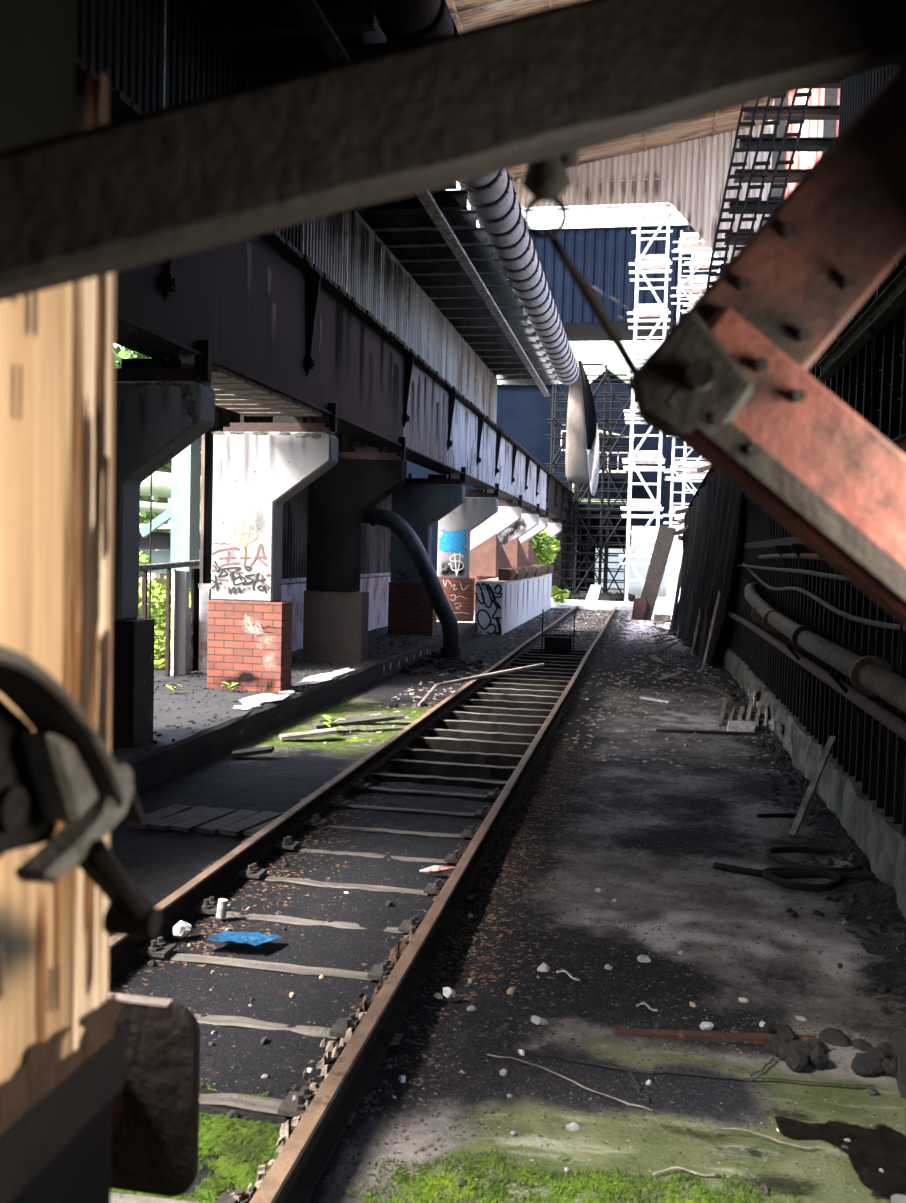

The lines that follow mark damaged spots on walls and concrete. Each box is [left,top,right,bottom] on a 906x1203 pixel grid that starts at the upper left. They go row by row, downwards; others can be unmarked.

damp [316,210,411,314]
damp [319,303,444,431]